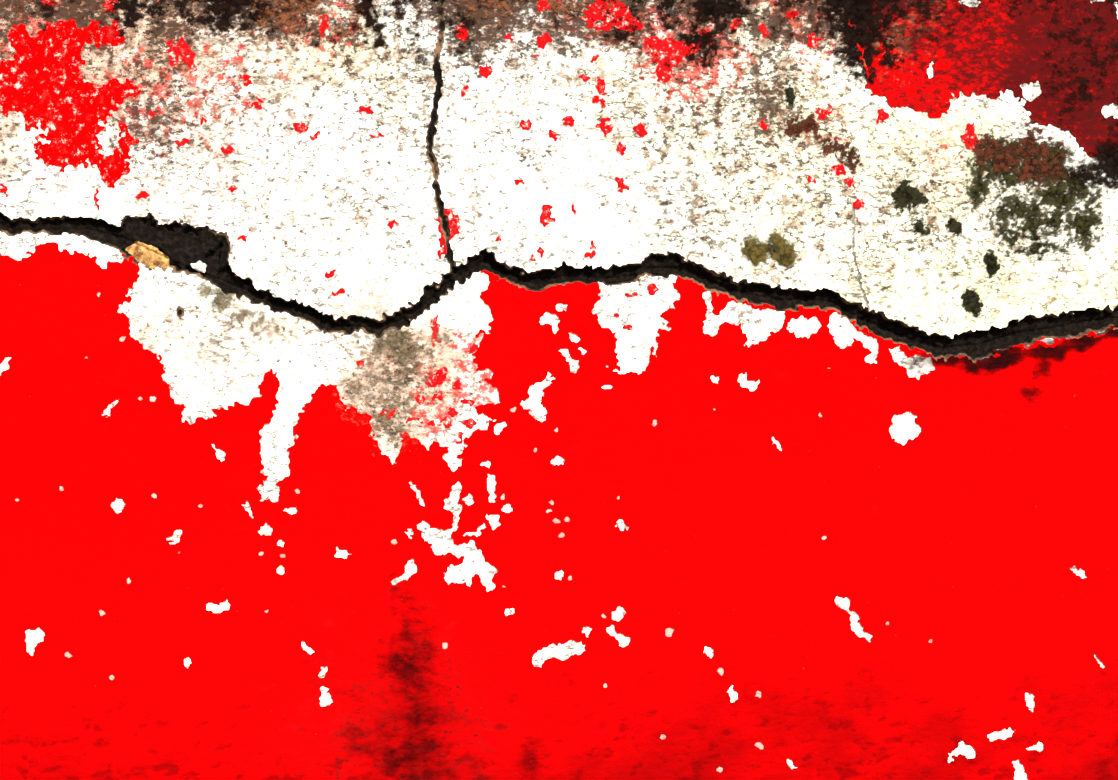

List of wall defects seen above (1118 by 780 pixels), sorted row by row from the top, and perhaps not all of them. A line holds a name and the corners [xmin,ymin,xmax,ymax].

crack [229,0,1118,363]
crack [0,212,126,251]
peeling [0,0,1118,592]
peeling [532,626,592,667]
peeling [607,606,630,647]
peeling [1012,742,1043,780]